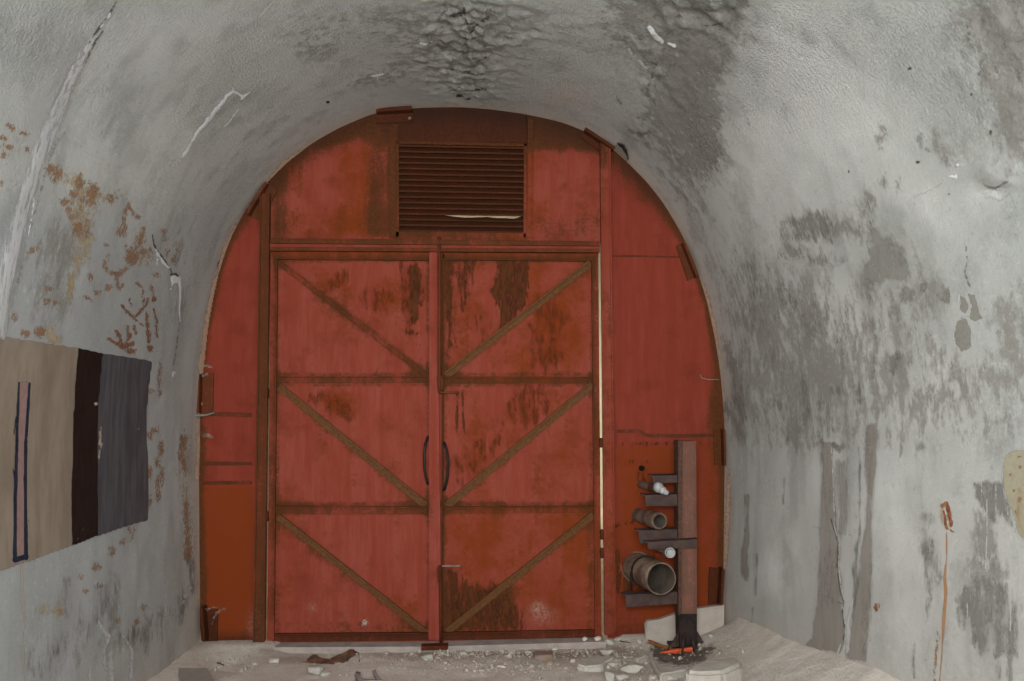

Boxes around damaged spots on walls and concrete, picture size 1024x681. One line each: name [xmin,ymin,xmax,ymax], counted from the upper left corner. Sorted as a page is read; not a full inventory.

water stain [610,0,747,170]
corrosion [44,165,161,354]
crack [152,234,182,361]
corrosion [399,262,424,335]
corrosion [490,261,563,372]
water stain [787,211,857,257]
peeling [939,271,982,352]
corrosion [445,569,523,631]
water stain [741,495,757,579]
water stain [807,424,876,661]
corrosion [933,536,947,681]
water stain [957,482,1016,681]